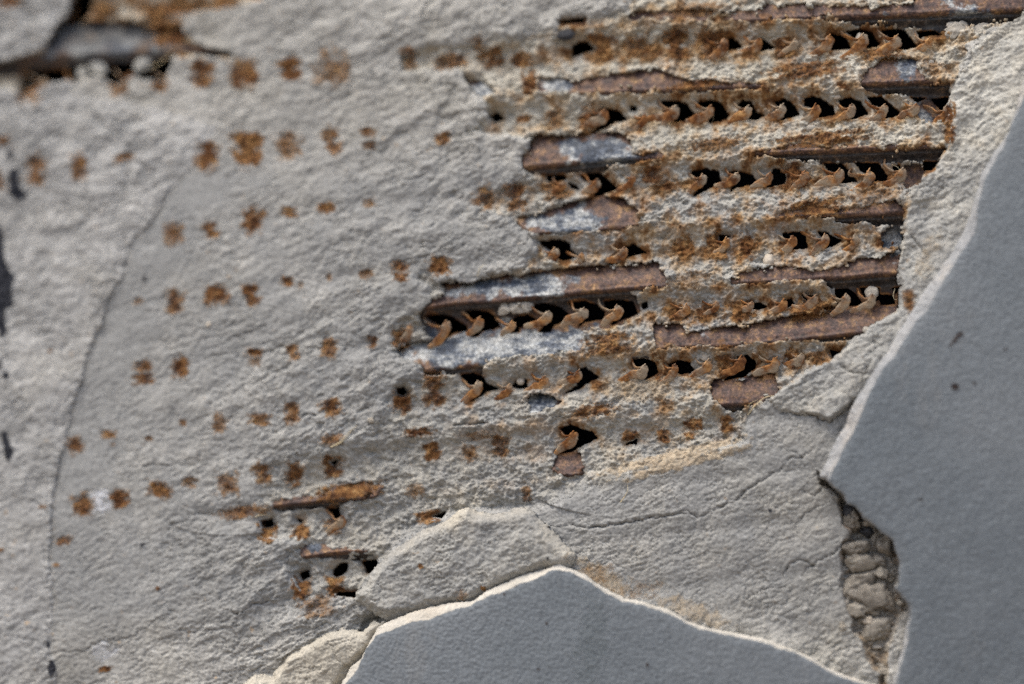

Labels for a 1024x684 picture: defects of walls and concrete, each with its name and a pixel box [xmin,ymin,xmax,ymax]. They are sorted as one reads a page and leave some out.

peeling [0,0,75,62]
flaking render [82,0,263,61]
corrosion [587,2,723,64]
flaking render [134,55,151,73]
corrosion [433,37,537,95]
corrosion [193,130,303,175]
corrosion [773,128,894,219]
corrosion [203,282,260,306]
peeling [0,60,218,684]
flaking render [243,0,1024,684]
corrosion [404,427,442,462]
crack [747,539,849,599]